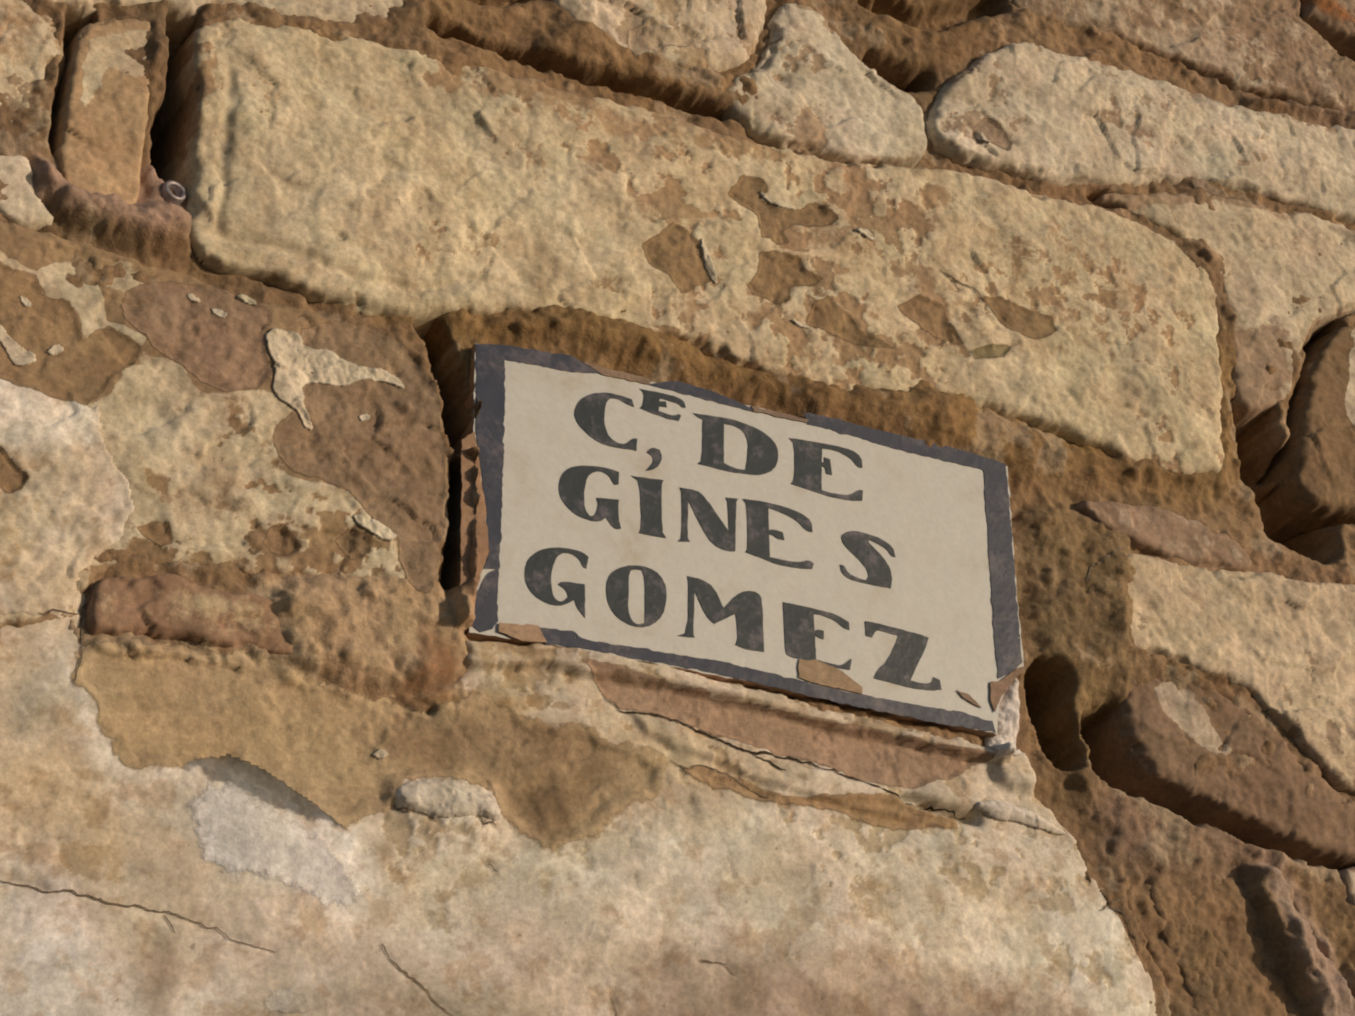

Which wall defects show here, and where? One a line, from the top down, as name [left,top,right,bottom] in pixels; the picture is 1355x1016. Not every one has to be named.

peeling [0,264,447,593]
peeling [70,636,668,851]
peeling [583,658,995,831]
crack [0,880,275,953]
crack [381,944,453,1016]